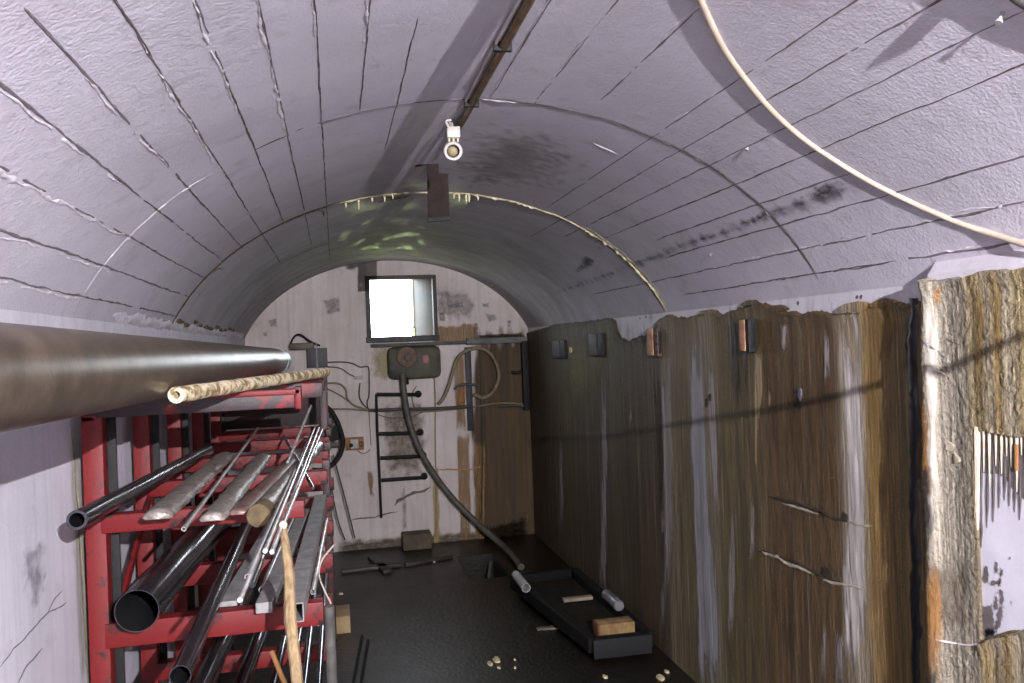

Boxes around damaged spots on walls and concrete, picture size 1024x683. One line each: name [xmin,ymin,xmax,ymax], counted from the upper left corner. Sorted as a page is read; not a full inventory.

crack [0,0,1024,324]
damp [341,192,427,210]
damp [432,192,1024,683]
crack [770,496,873,528]
damp [341,538,402,551]
peeling [974,427,1024,641]
crack [758,549,861,589]